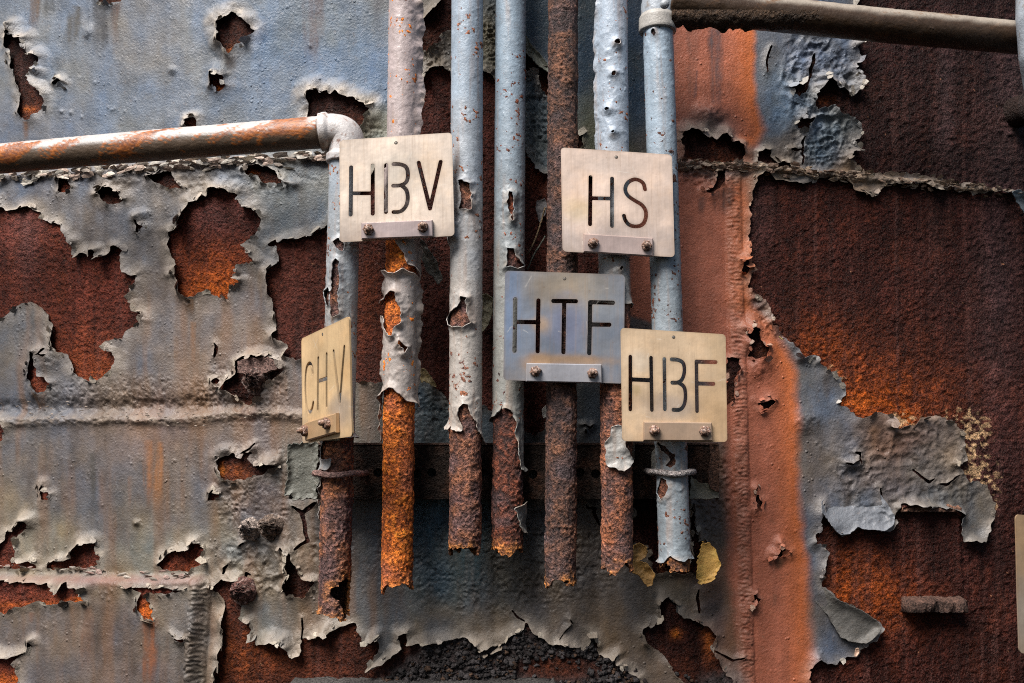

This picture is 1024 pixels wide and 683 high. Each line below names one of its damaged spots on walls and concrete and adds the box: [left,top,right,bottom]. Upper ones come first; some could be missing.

peeling [0,0,548,473]
peeling [0,441,745,683]
peeling [643,26,1024,683]
peeling [845,0,1016,20]